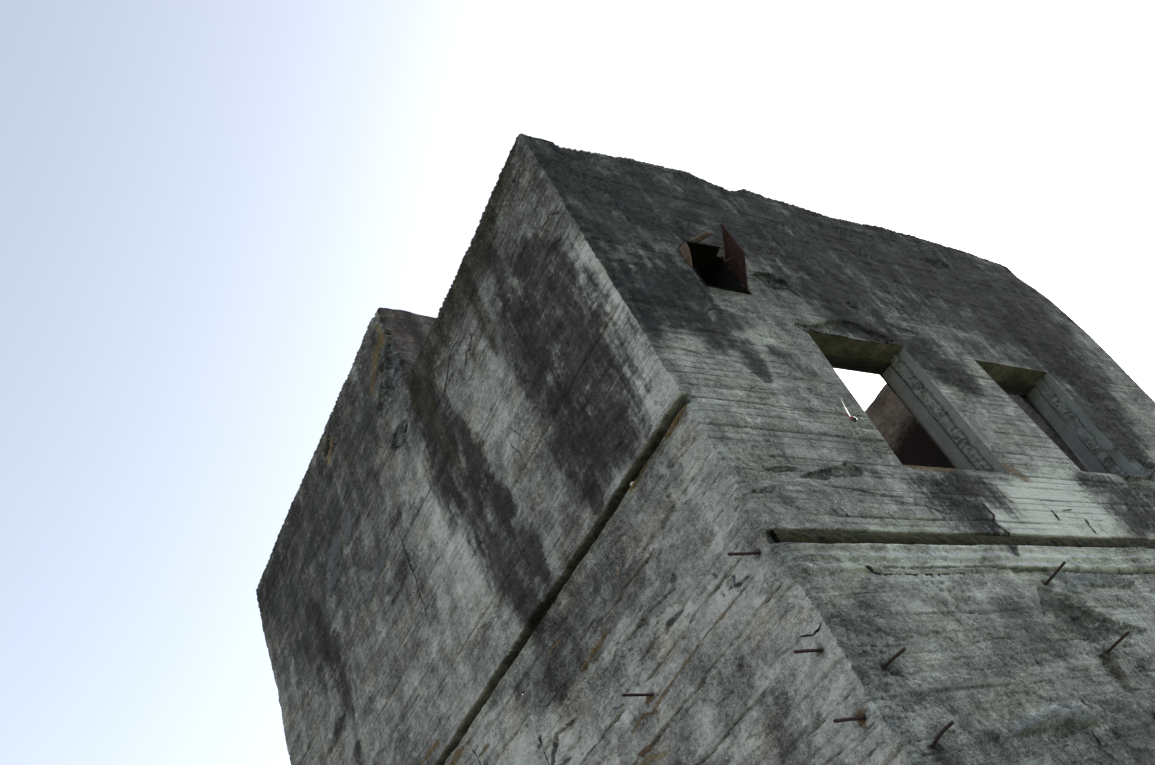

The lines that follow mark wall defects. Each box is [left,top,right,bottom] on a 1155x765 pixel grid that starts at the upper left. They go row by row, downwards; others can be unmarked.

leakage [464,133,1155,540]
leakage [387,368,553,635]
leakage [907,469,1019,556]
leakage [1099,653,1131,689]